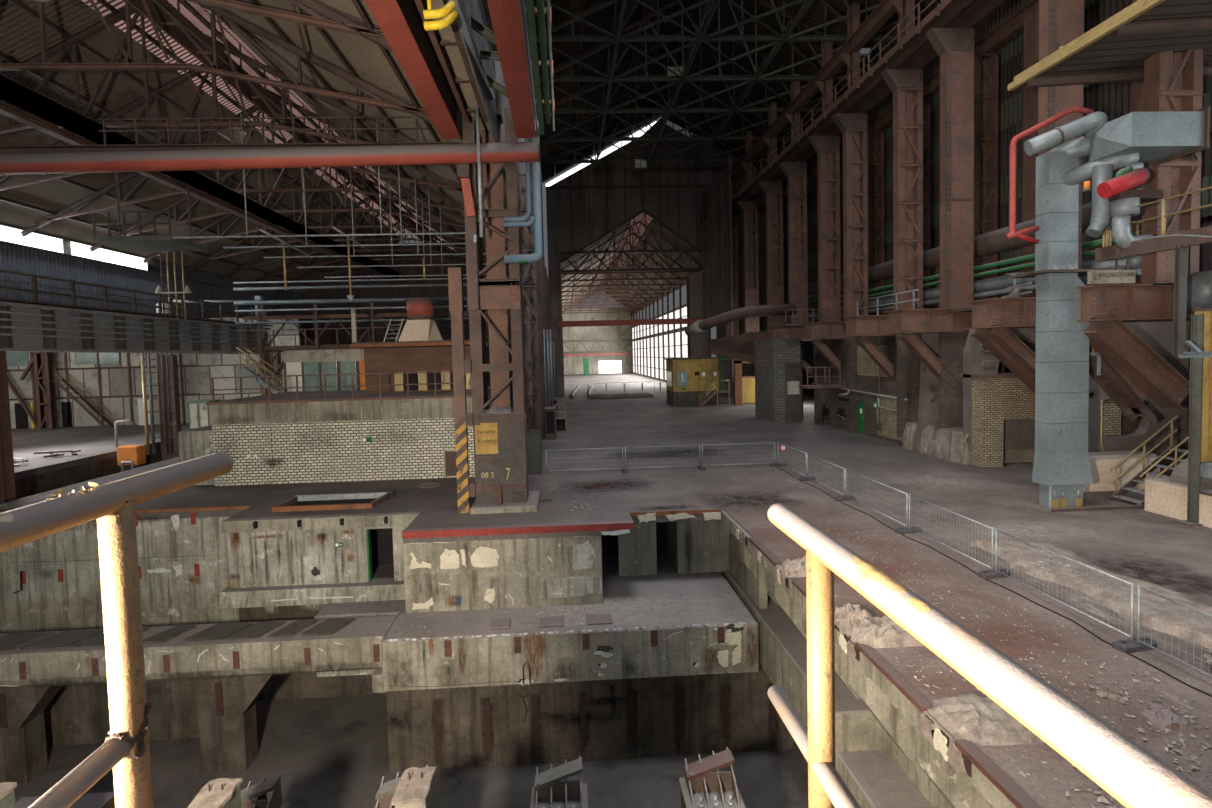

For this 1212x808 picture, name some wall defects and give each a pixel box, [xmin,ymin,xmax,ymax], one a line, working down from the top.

spalling [601,512,721,535]
peeling [409,542,499,569]
peeling [538,536,602,600]
spalling [733,527,806,588]
spalling [834,603,925,662]